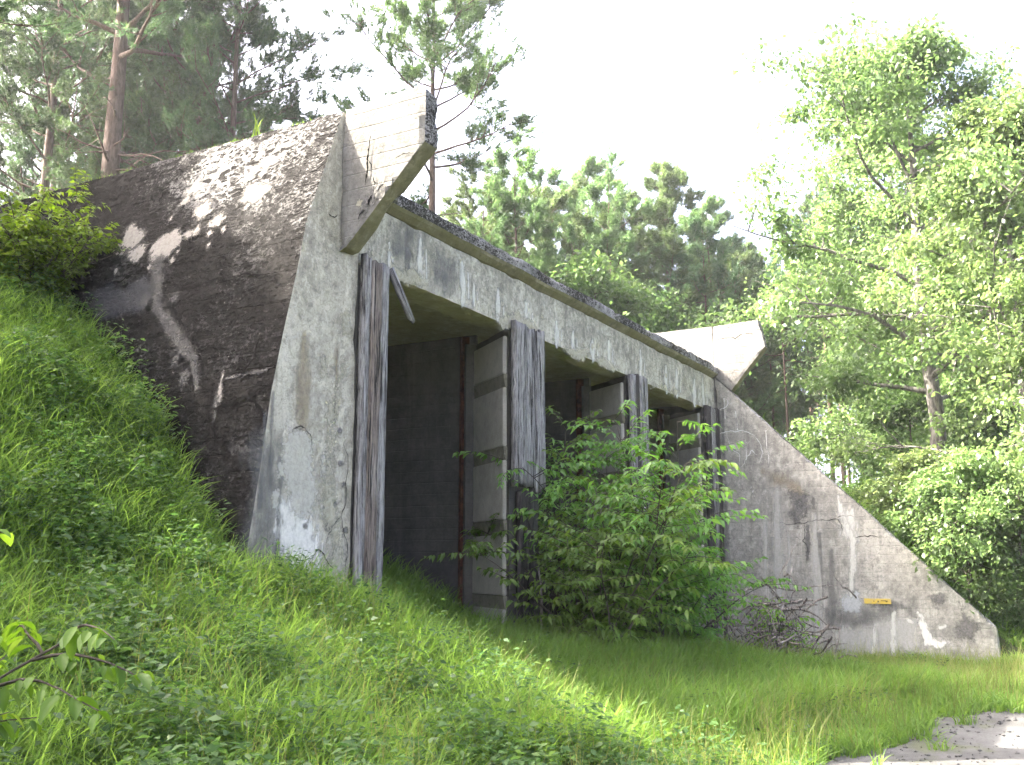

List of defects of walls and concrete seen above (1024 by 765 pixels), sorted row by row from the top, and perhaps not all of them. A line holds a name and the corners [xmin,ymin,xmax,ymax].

leakage [388,232,478,307]
leakage [496,289,505,321]
leakage [555,320,614,363]
leakage [664,365,708,406]
leakage [247,392,323,575]
crack [308,447,348,579]
leakage [764,488,792,626]
crack [780,515,879,555]
leakage [837,496,859,597]
leakage [813,515,907,635]